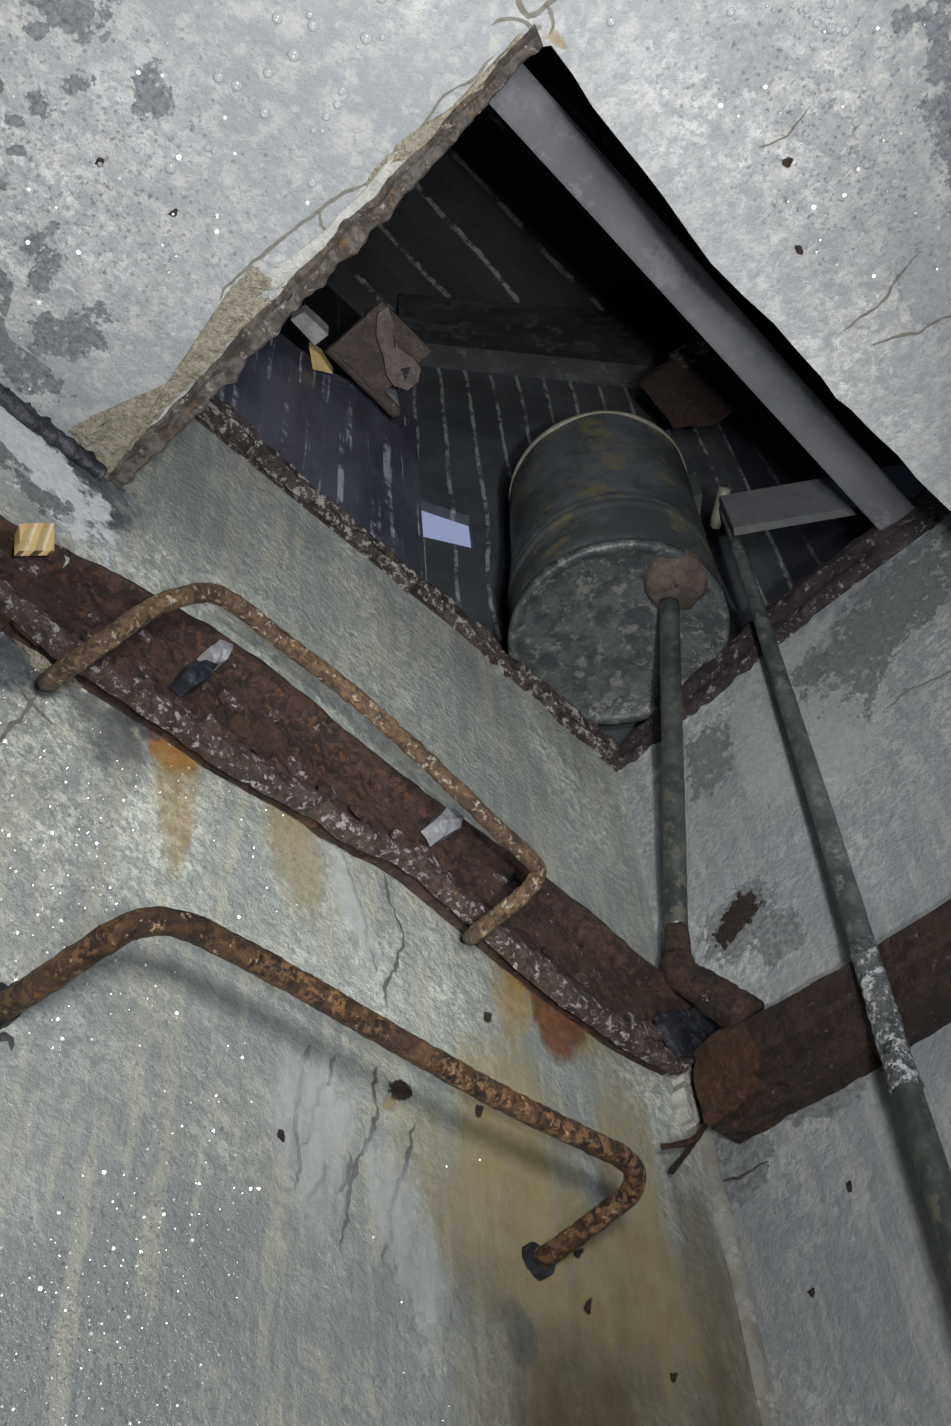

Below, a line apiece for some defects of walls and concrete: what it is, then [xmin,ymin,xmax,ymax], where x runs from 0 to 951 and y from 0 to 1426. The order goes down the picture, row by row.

corrosion [149,731,197,773]
corrosion [504,970,585,1059]